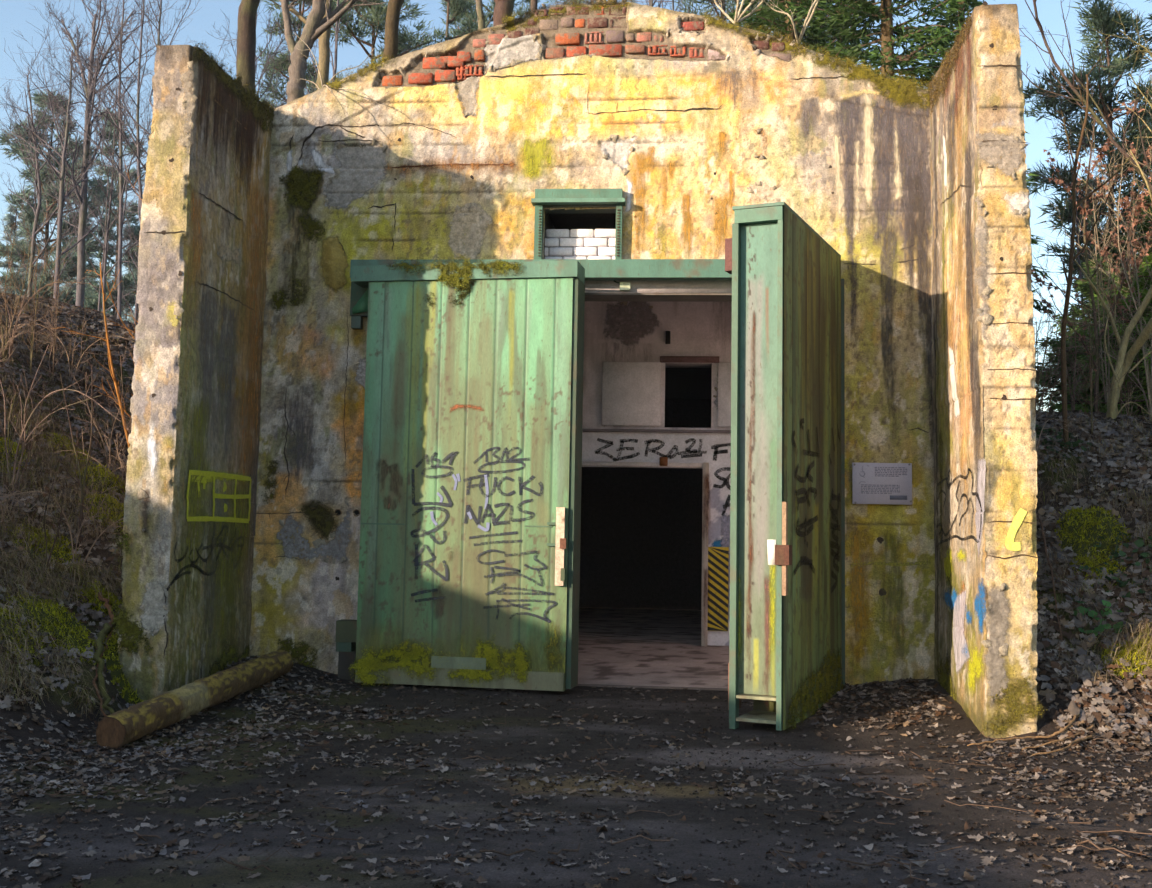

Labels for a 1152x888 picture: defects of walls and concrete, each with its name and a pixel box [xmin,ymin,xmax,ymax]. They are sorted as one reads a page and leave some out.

rust [196,60,261,184]
crack [289,123,454,166]
flaking render [371,0,730,118]
damp [721,71,739,101]
damp [802,98,818,136]
damp [834,89,986,677]